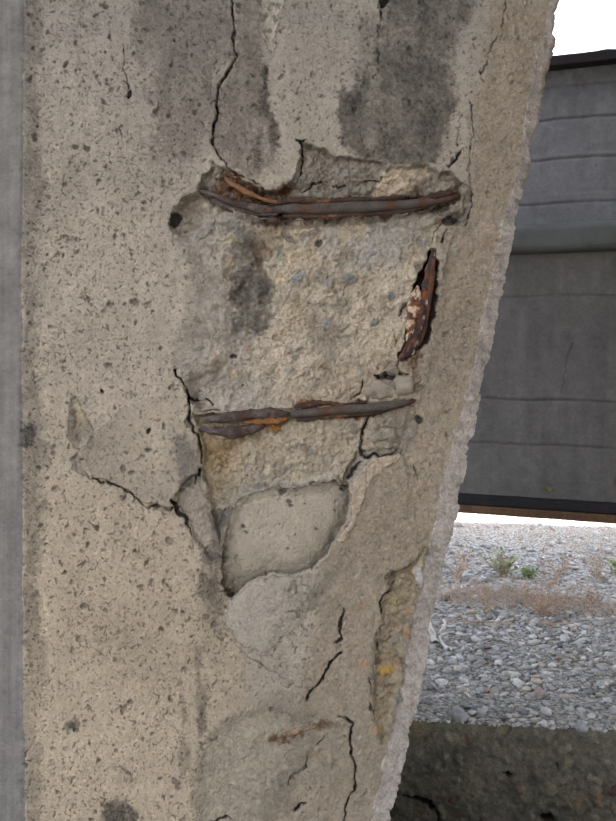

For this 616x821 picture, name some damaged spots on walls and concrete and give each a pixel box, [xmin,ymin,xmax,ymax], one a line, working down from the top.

crack [211,1,264,189]
damp [250,66,280,168]
damp [338,0,468,164]
crack [449,102,474,167]
rust [215,172,368,228]
spalling [170,140,472,596]
crack [174,369,214,484]
rust [261,421,287,433]
crack [93,478,192,535]
crack [306,613,344,700]
crack [338,715,357,821]